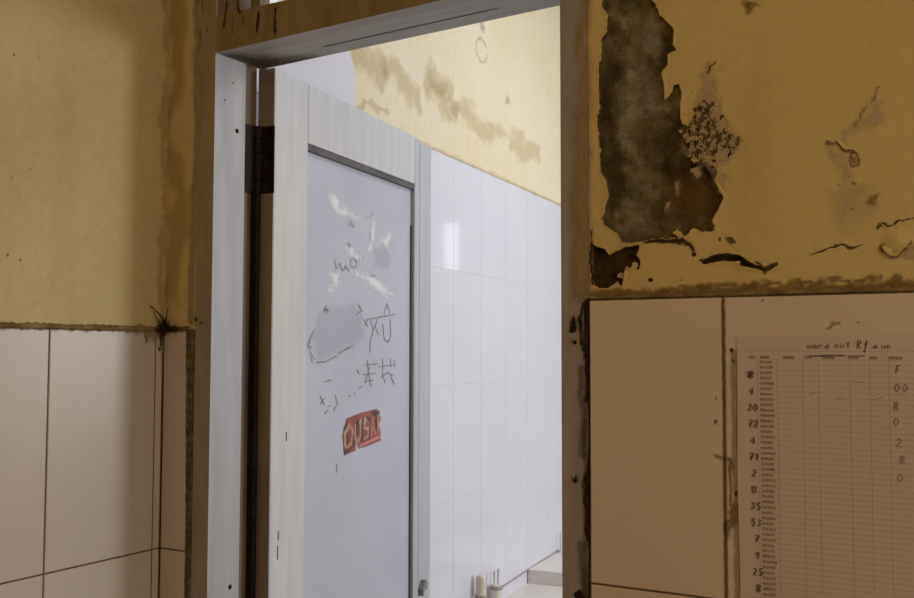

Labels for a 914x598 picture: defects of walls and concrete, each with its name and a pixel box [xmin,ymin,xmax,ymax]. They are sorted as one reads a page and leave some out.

spalling [589,0,746,290]
crack [644,237,778,274]
crack [809,218,914,255]
leakage [578,274,914,598]